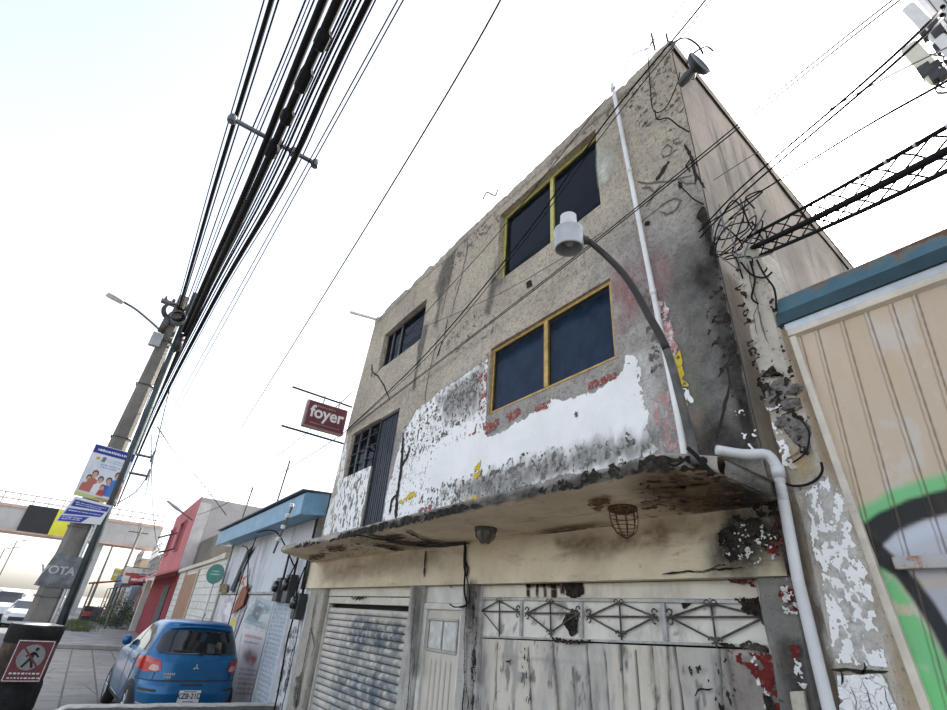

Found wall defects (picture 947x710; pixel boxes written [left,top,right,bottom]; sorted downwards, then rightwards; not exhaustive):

spalling [696,206,812,469]
peeling [294,289,785,566]
damp [641,475,789,573]
peeling [728,578,757,587]
peeling [778,578,799,615]
peeling [805,477,897,710]
peeling [688,643,780,710]
peeling [789,645,807,689]
crack [831,662,891,710]